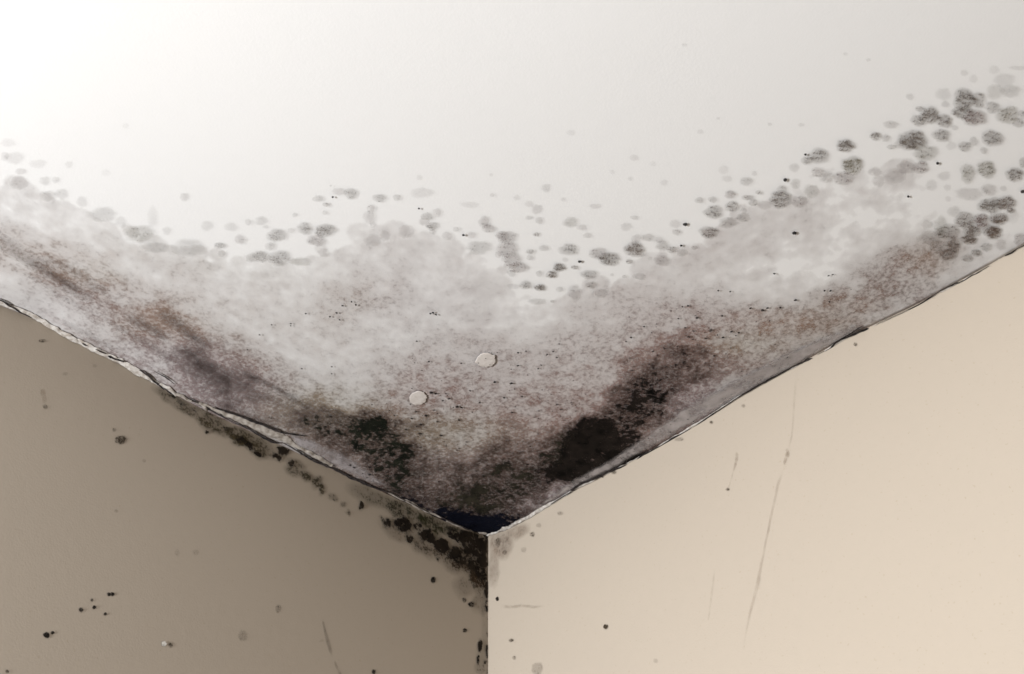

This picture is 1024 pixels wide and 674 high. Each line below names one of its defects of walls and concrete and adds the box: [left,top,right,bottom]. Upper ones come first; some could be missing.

damp [899,91,1001,171]
damp [837,140,860,181]
flaking render [475,353,496,368]
flaking render [409,391,427,405]
damp [20,169,1024,674]